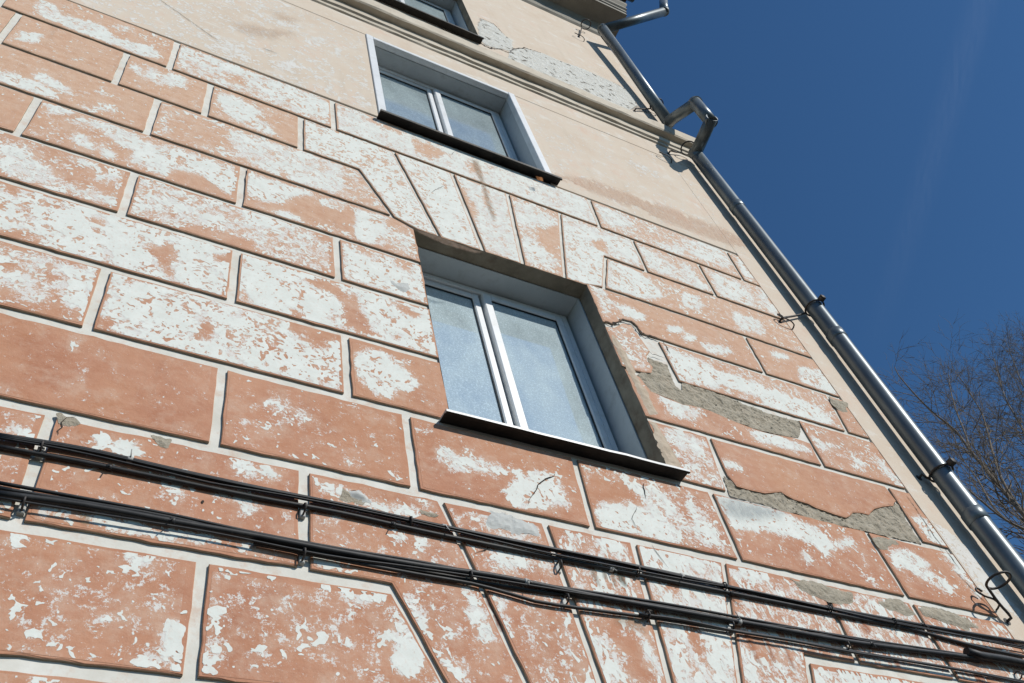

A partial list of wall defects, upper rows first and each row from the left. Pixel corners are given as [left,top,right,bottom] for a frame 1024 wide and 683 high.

peeling [0,0,904,487]
crack [603,319,668,358]
peeling [0,314,296,563]
peeling [0,673,86,683]
peeling [0,533,187,672]
peeling [202,568,439,683]
peeling [312,476,595,683]
peeling [552,529,665,683]
peeling [639,422,1024,683]